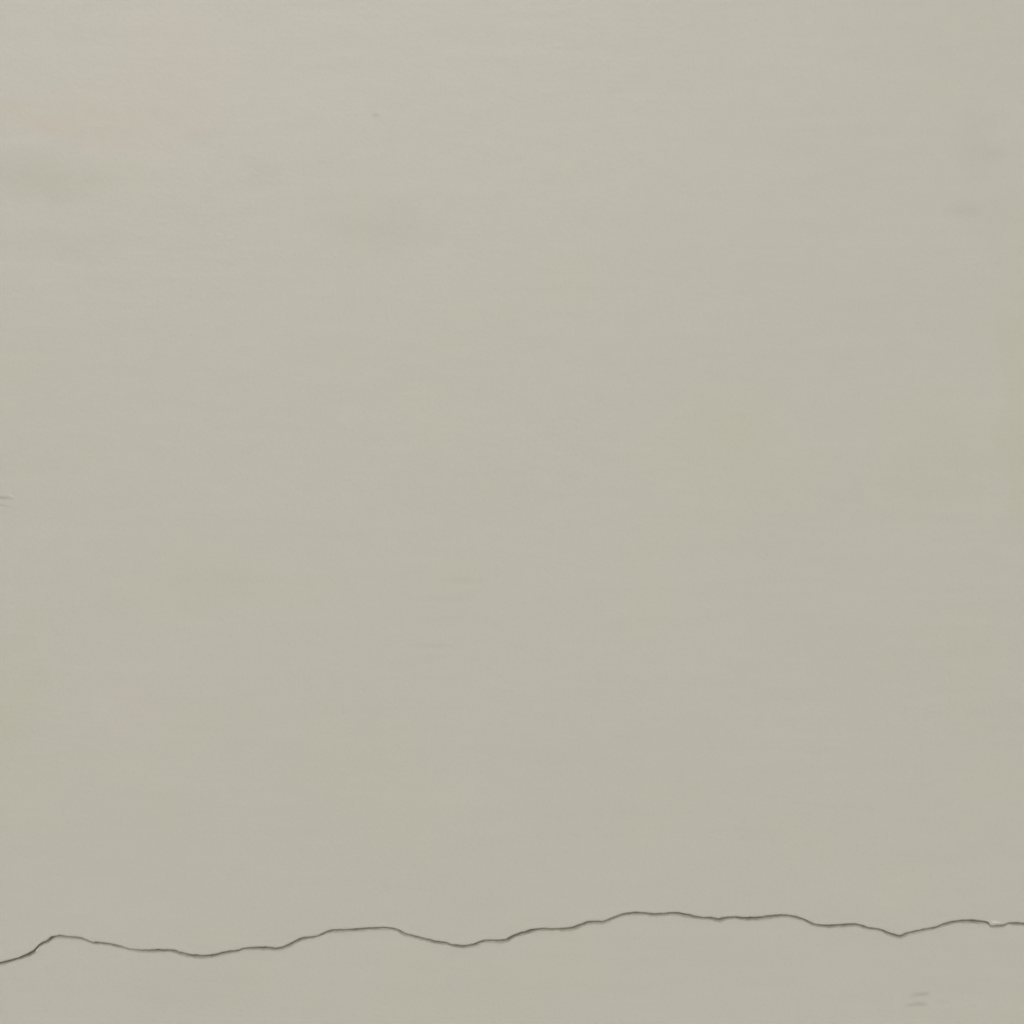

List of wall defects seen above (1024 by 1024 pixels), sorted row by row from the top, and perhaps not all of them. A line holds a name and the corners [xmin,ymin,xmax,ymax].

crack [0,909,1024,968]